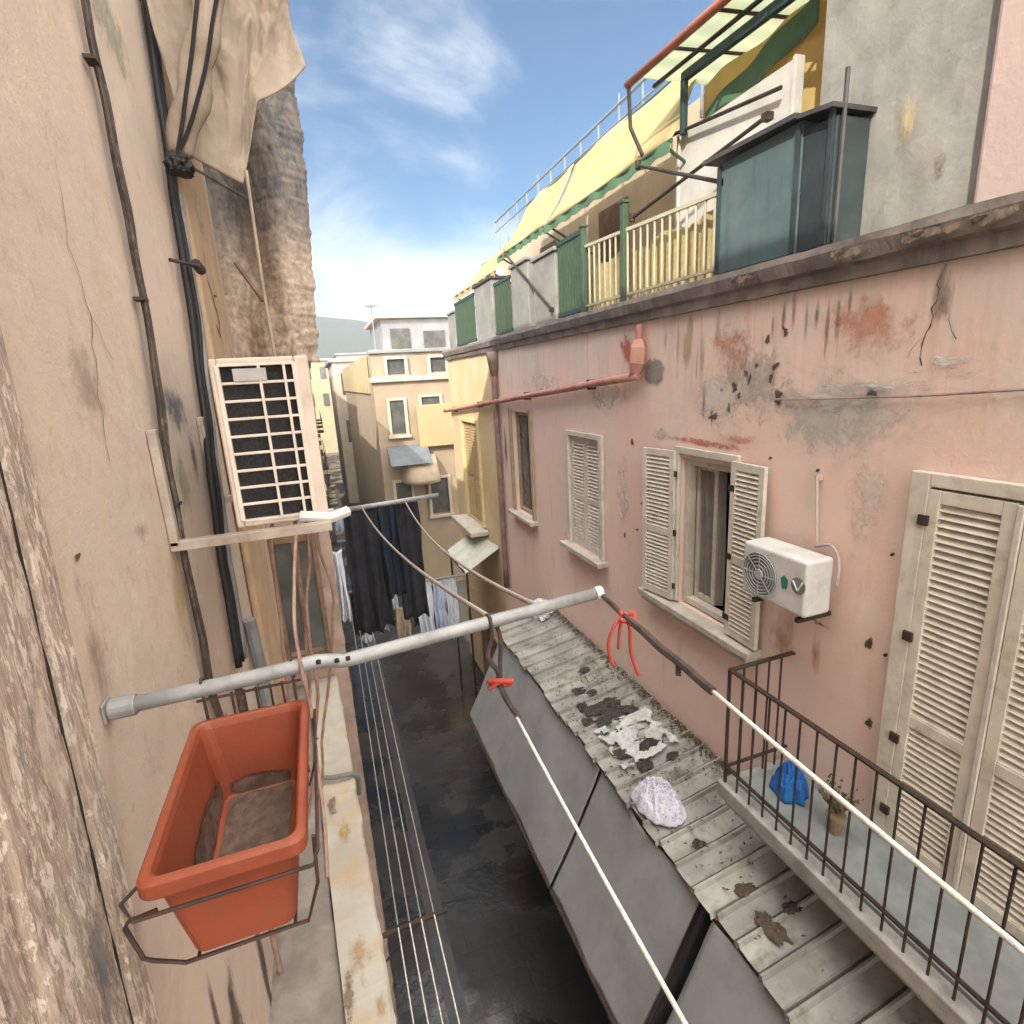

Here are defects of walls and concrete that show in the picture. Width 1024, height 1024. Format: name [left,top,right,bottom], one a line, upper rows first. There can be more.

spalling [891,204,1020,244]
crack [55,159,113,461]
leakage [772,295,851,352]
crack [907,264,957,366]
flaking render [697,333,789,420]